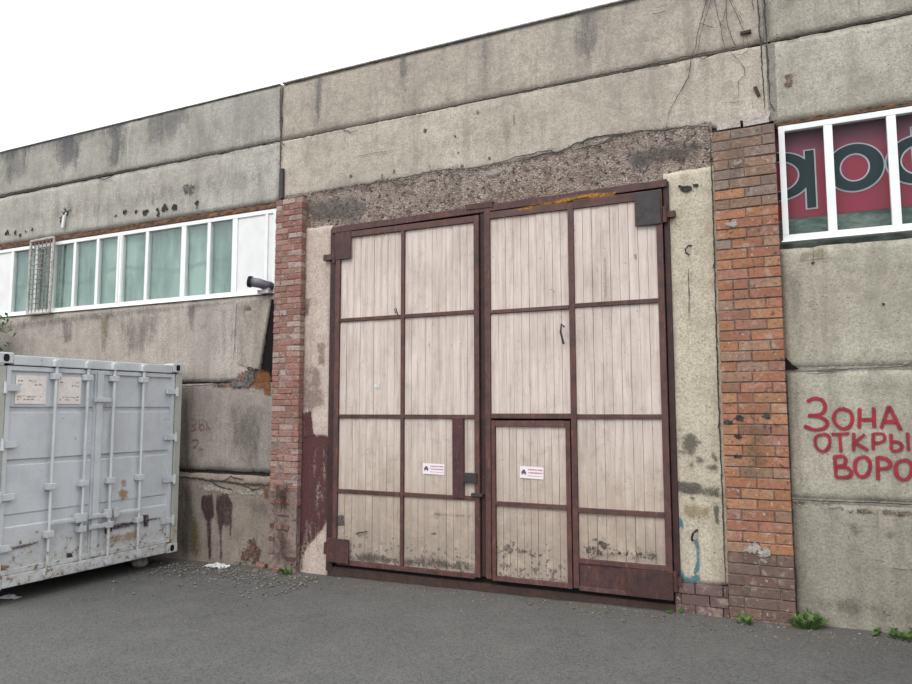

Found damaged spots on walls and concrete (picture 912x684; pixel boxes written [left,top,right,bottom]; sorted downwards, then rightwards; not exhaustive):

crack [0,0,912,198]
spalling [114,203,177,217]
spalling [284,121,713,228]
crack [179,476,269,490]